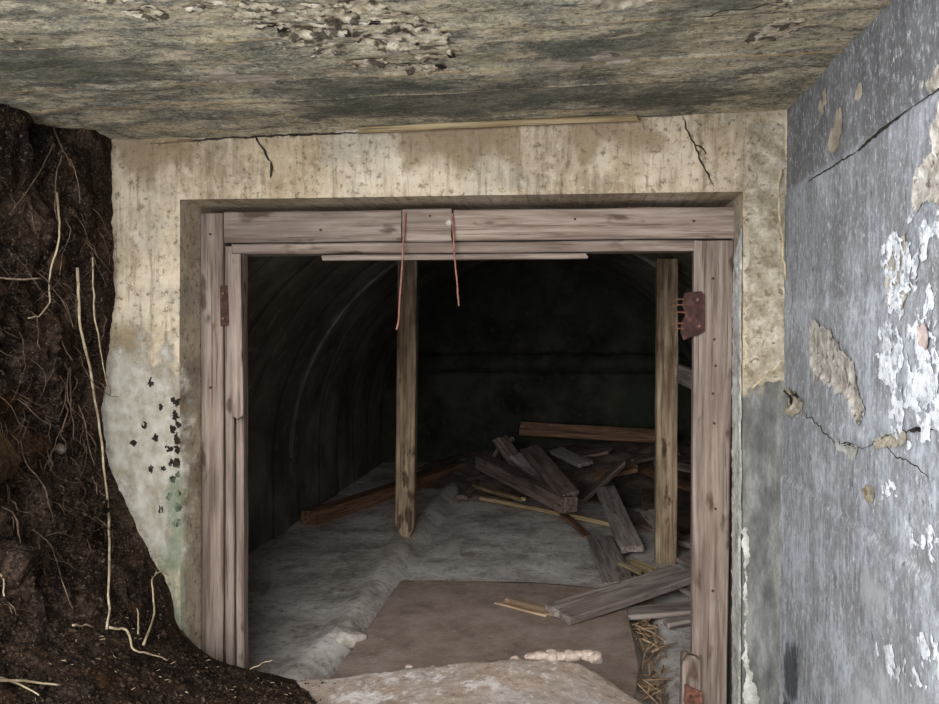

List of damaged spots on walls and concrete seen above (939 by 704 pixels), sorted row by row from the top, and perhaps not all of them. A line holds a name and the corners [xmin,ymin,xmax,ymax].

spalling [70,0,171,22]
spalling [184,0,464,76]
crack [150,132,358,178]
crack [682,117,713,185]
crack [809,88,939,181]
peeling [874,64,939,450]
water stain [101,329,189,563]
crack [805,413,933,478]